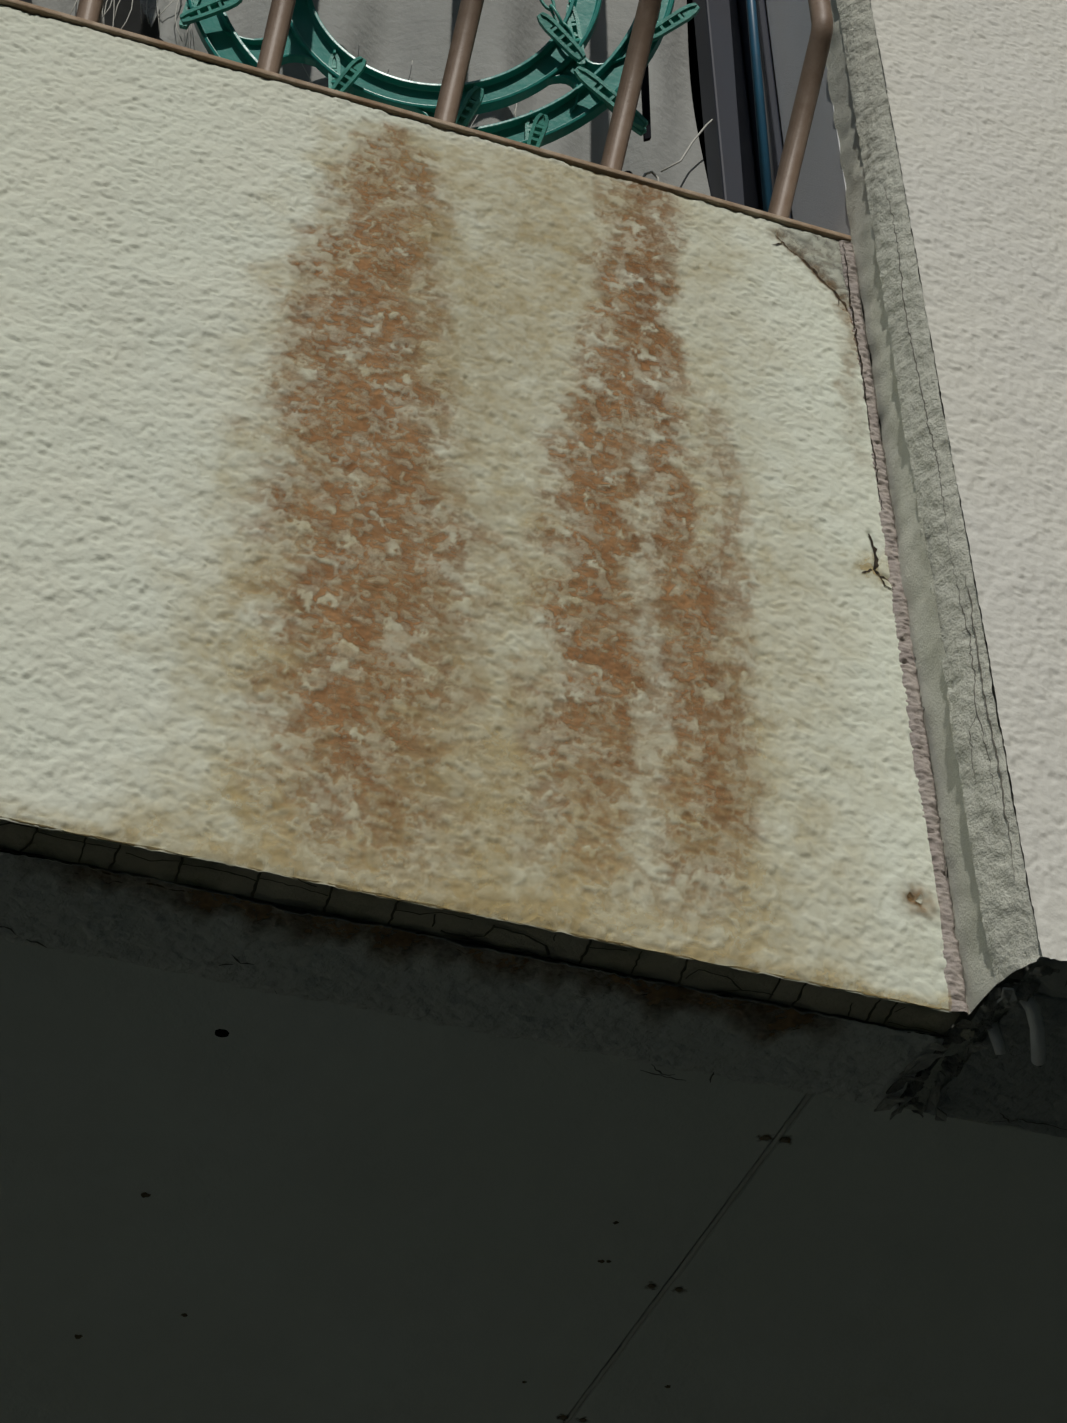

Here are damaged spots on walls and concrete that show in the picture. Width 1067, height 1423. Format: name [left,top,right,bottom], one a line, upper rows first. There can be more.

crack [0,822,334,916]
rust [207,127,476,892]
crack [387,901,808,1012]
rust [483,185,770,955]
crack [772,235,969,1008]
crack [848,998,949,1037]
crack [884,187,1015,879]
spalling [889,965,1060,1121]